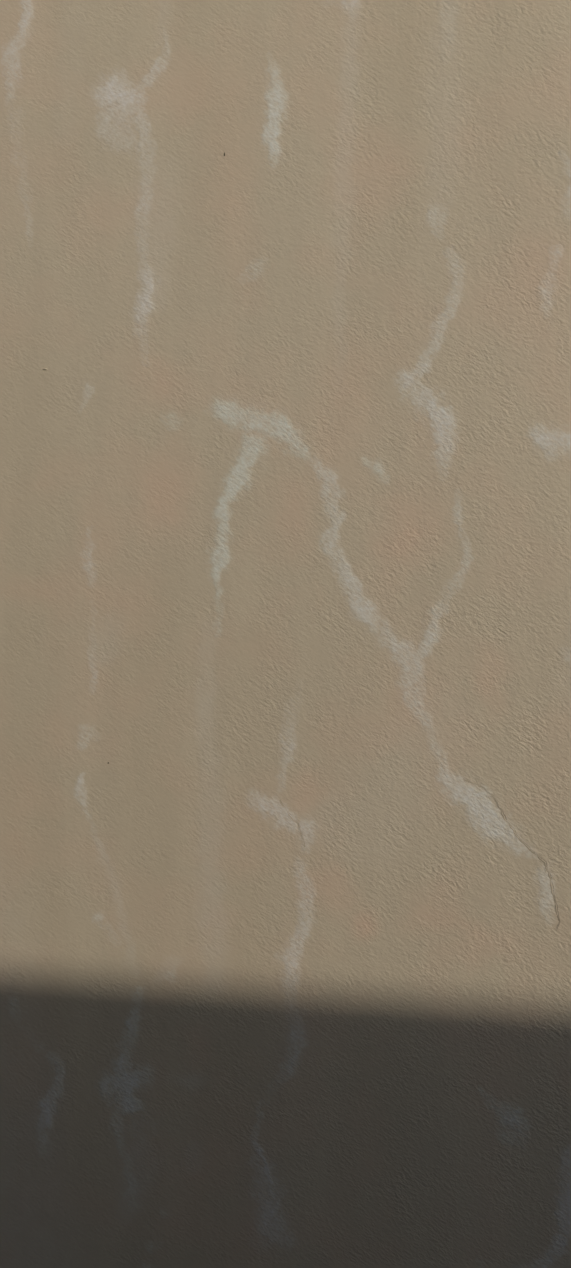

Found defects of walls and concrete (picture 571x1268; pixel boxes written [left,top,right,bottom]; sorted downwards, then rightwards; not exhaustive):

water stain [0,0,38,249]
water stain [86,27,173,369]
water stain [258,50,294,172]
water stain [202,202,559,928]
water stain [241,677,324,1255]
crack [464,779,560,930]